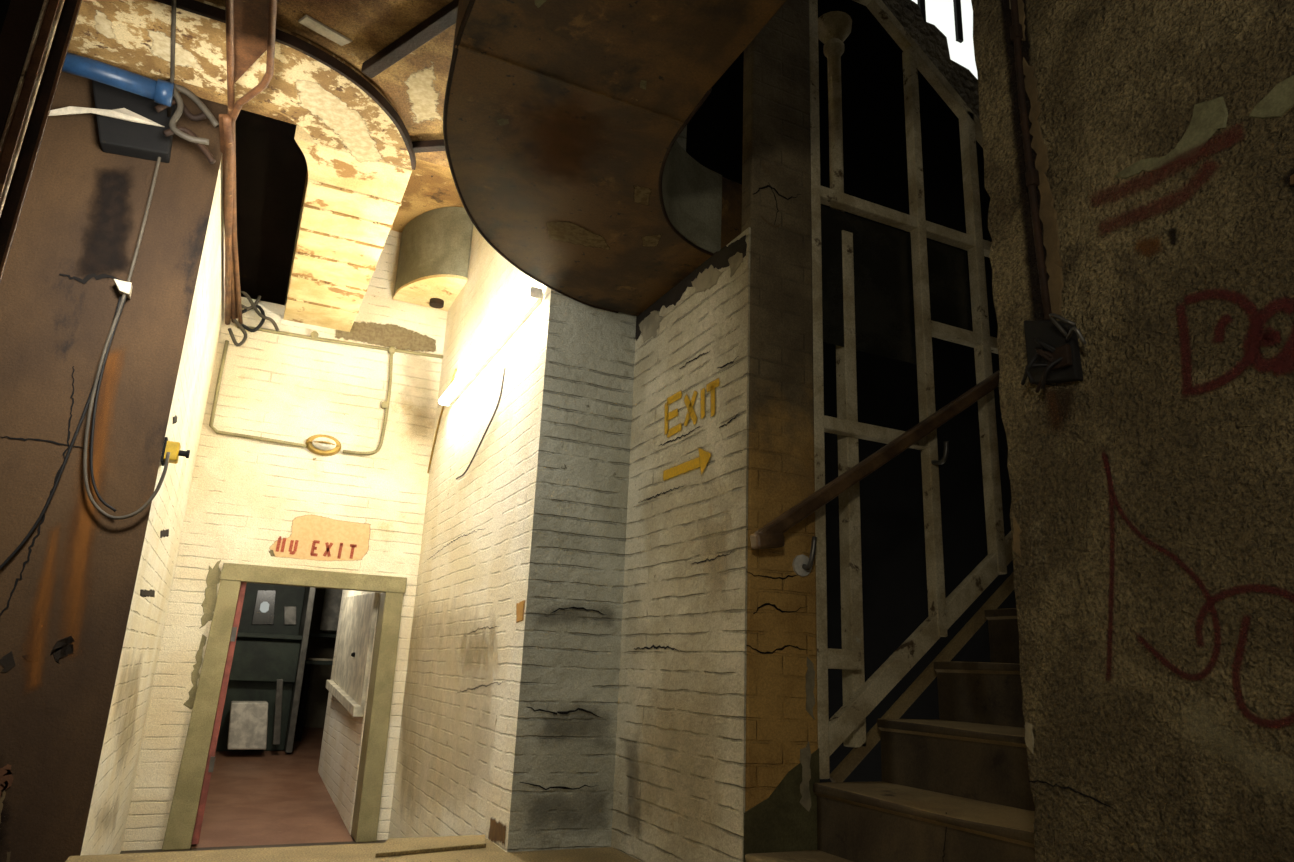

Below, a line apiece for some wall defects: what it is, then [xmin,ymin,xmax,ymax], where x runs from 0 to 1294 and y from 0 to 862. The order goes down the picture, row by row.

peeling [95,10,115,39]
peeling [147,30,203,70]
peeling [1249,75,1294,119]
peeling [295,80,382,162]
peeling [1114,96,1228,179]
crack [679,351,739,369]
crack [659,414,738,446]
crack [692,551,808,614]
peeling [183,560,221,710]
crack [634,644,681,652]
crack [527,707,602,718]
crack [520,782,597,790]